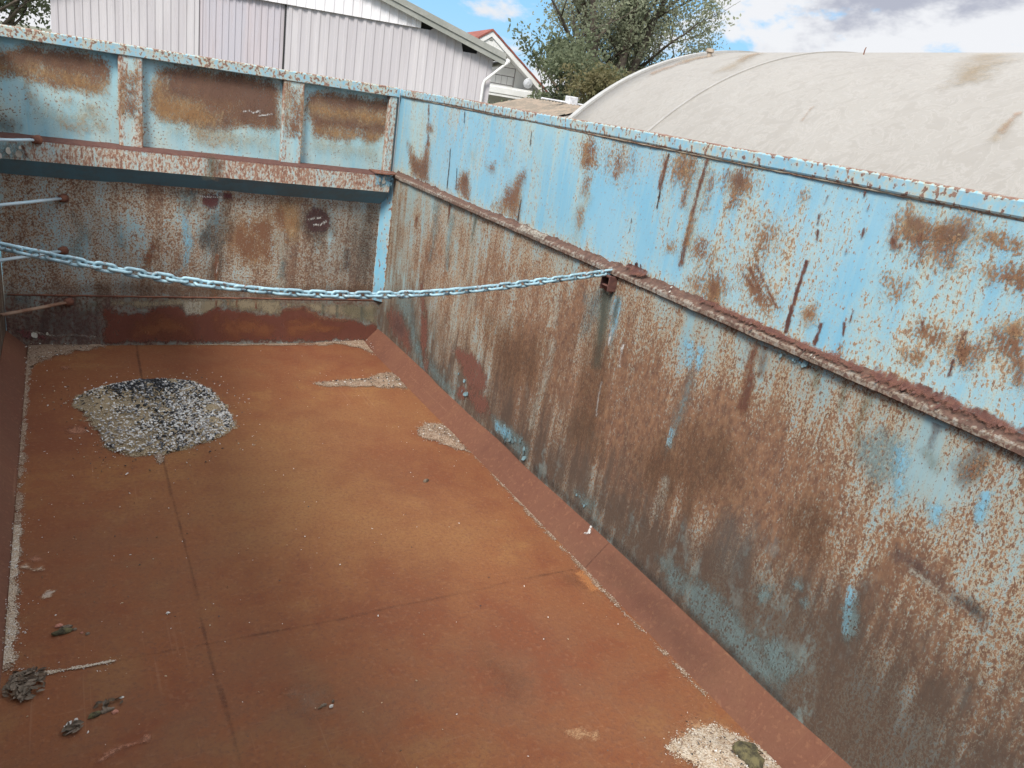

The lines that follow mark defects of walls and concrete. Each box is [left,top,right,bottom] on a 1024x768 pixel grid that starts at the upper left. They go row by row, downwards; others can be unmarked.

corrosion [0,42,387,155]
corrosion [197,193,232,209]
corrosion [221,202,331,273]
corrosion [456,170,471,200]
corrosion [490,167,526,220]
corrosion [576,135,637,228]
corrosion [660,153,761,306]
corrosion [749,210,793,267]
corrosion [102,279,429,373]
corrosion [799,300,818,327]
corrosion [878,200,1024,391]
corrosion [736,344,759,416]